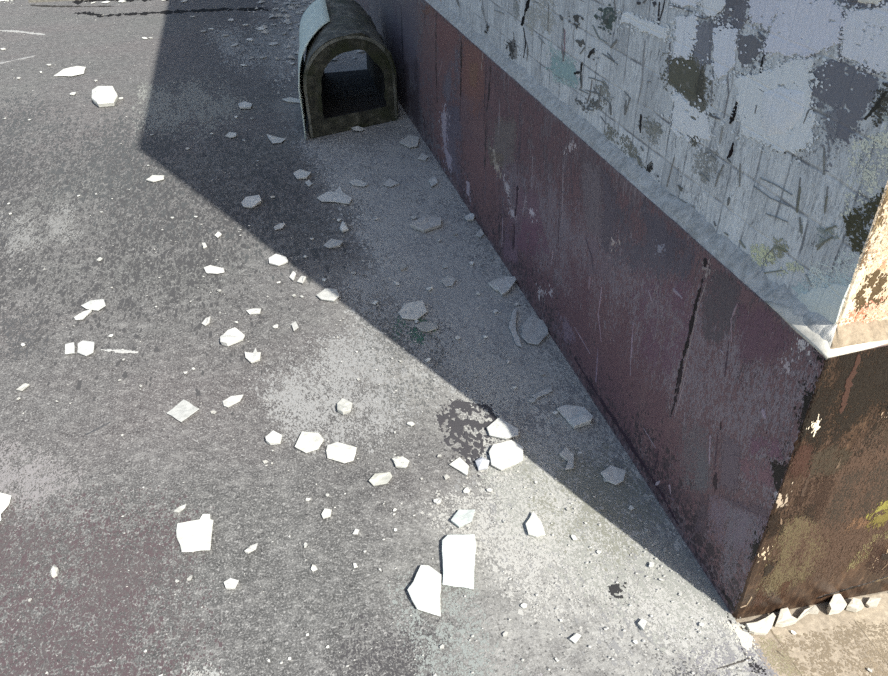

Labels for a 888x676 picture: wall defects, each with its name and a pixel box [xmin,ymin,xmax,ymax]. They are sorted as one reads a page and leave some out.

spalling [568,13,599,61]
spalling [594,2,617,35]
crack [456,0,836,274]
peeling [660,0,769,115]
crack [837,0,858,54]
peeling [809,54,888,147]
peeling [833,0,888,11]
crack [864,91,887,120]
peeling [845,187,888,321]
crack [574,238,679,525]
crack [670,258,708,417]
crack [817,354,861,424]